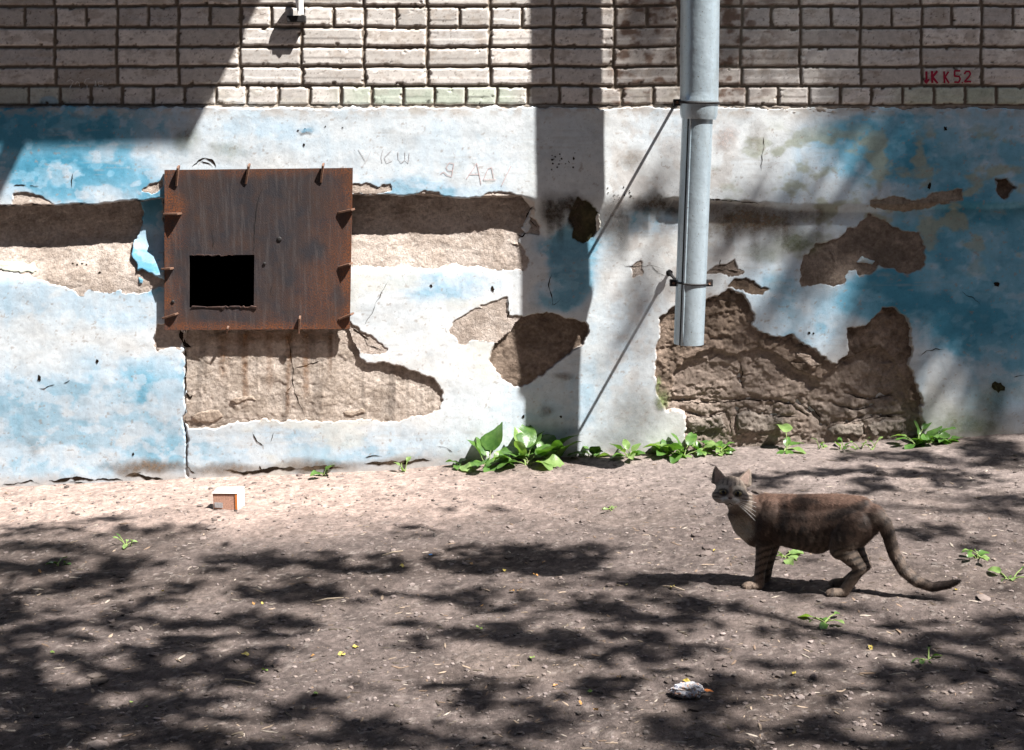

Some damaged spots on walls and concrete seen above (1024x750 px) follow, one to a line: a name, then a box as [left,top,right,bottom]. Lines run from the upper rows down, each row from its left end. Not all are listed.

spalling [0,181,164,296]
spalling [351,183,540,271]
peeling [799,182,963,287]
spalling [995,179,1015,199]
spalling [154,322,443,429]
spalling [450,286,588,387]
spalling [655,260,922,449]